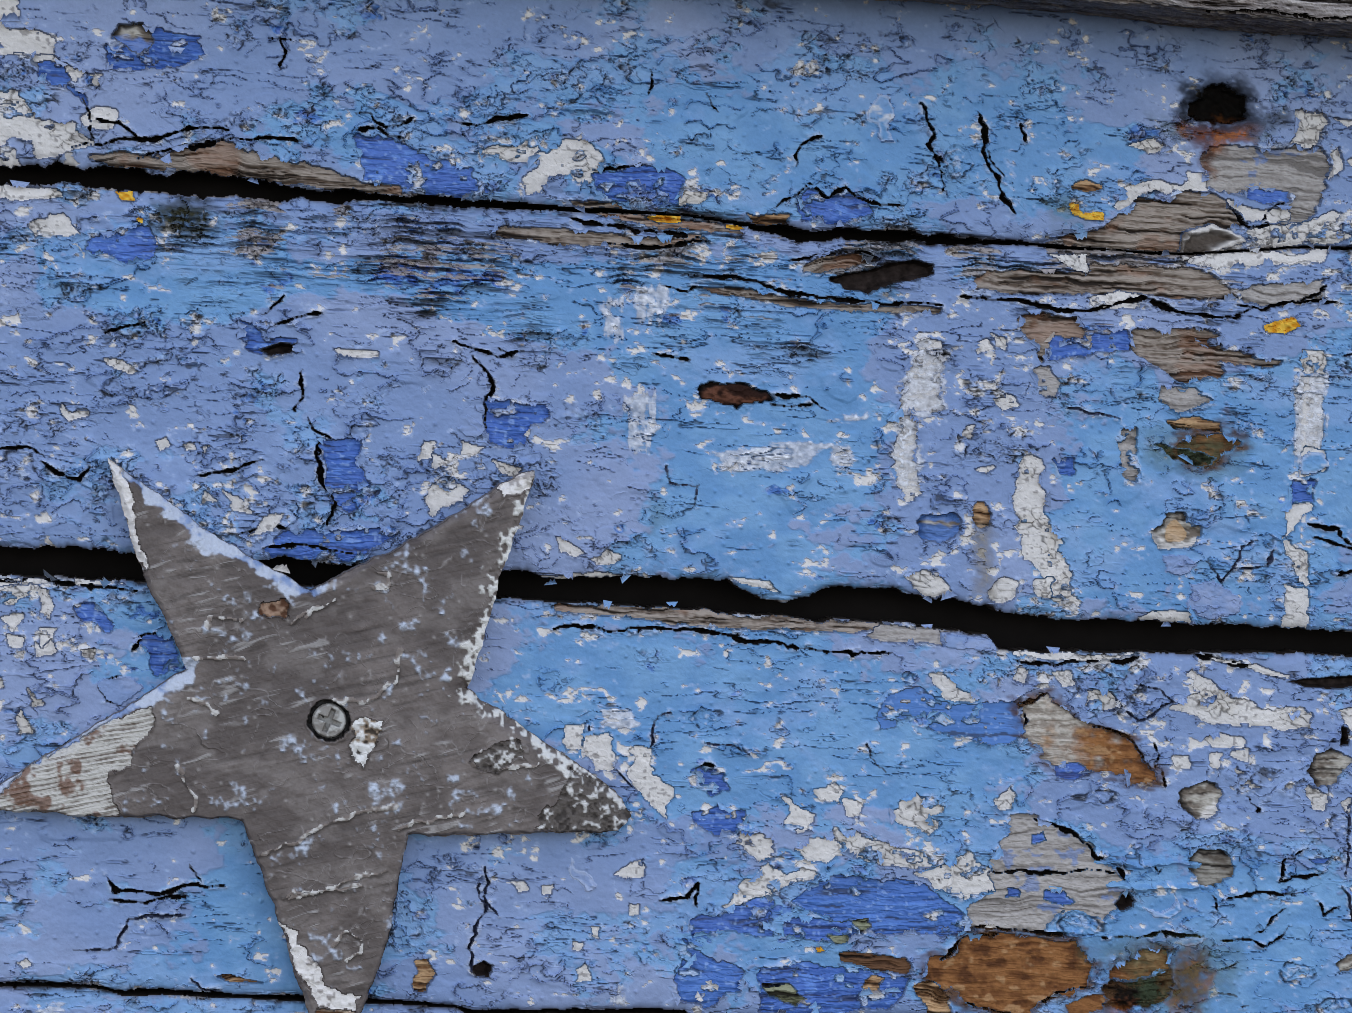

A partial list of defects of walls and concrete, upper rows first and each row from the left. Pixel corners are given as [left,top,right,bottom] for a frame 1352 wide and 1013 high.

peeling [0,0,748,267]
crack [920,102,945,191]
crack [978,114,1027,214]
crack [571,218,1337,319]
peeling [968,107,1352,418]
peeling [317,433,370,512]
peeling [962,425,975,439]
peeling [988,445,1081,606]
peeling [1280,350,1329,628]
peeling [1054,761,1088,783]
peeling [671,766,1129,1013]
peeling [1179,938,1206,946]